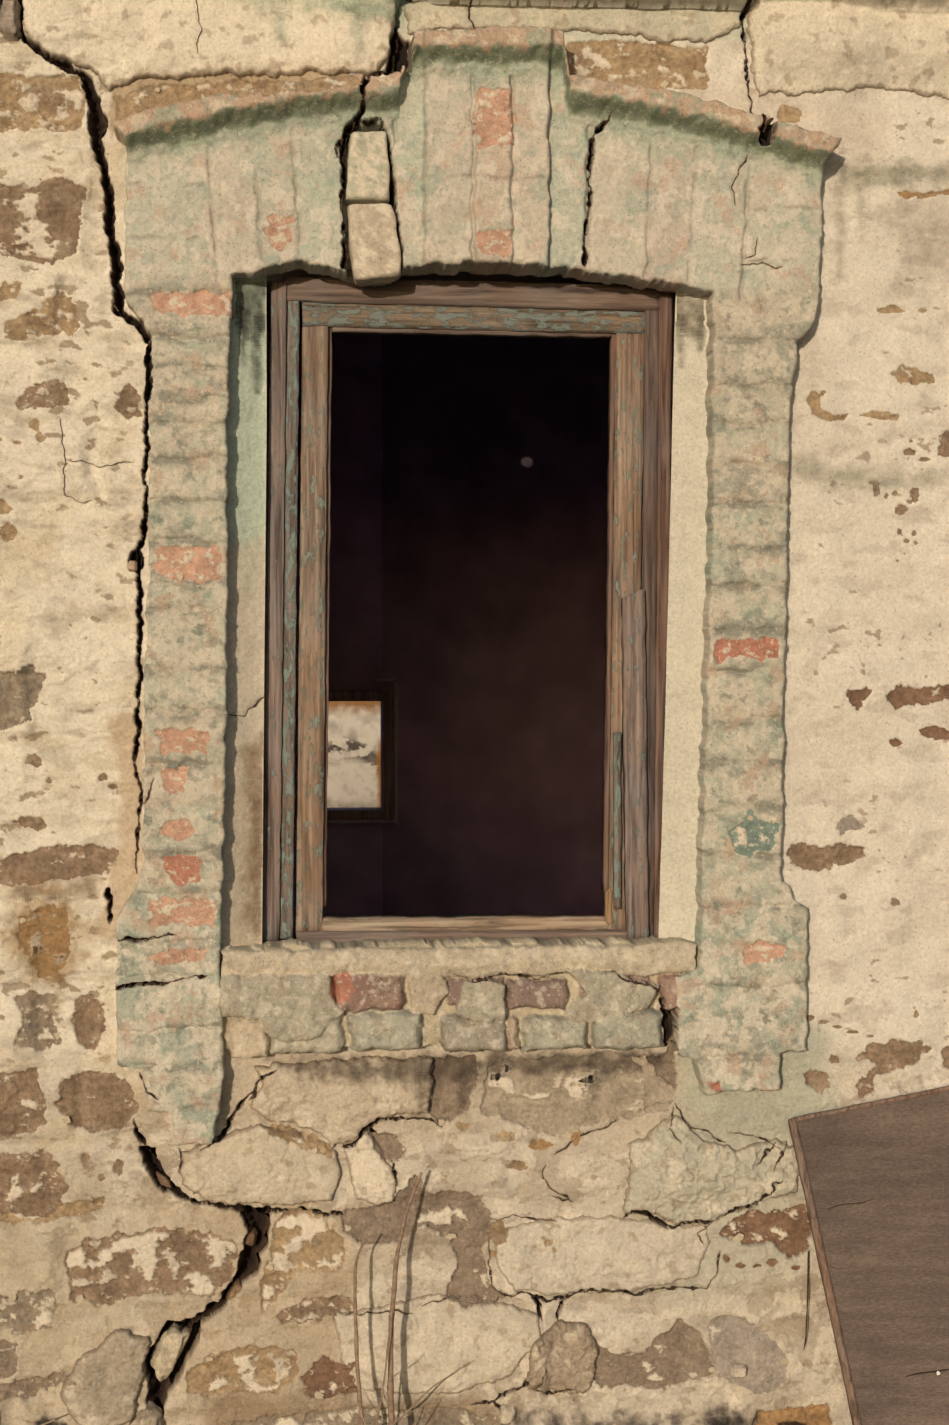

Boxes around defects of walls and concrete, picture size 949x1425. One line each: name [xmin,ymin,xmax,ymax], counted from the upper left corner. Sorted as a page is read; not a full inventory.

crack [334,0,409,270]
crack [581,113,611,267]
peeling [565,39,710,90]
crack [731,0,771,204]
crack [18,0,176,942]
peeling [806,391,900,422]
peeling [0,664,46,730]
peeling [846,684,949,711]
peeling [728,809,865,872]
peeling [803,1015,949,1098]
crack [133,1070,347,1414]
crack [341,1101,787,1322]